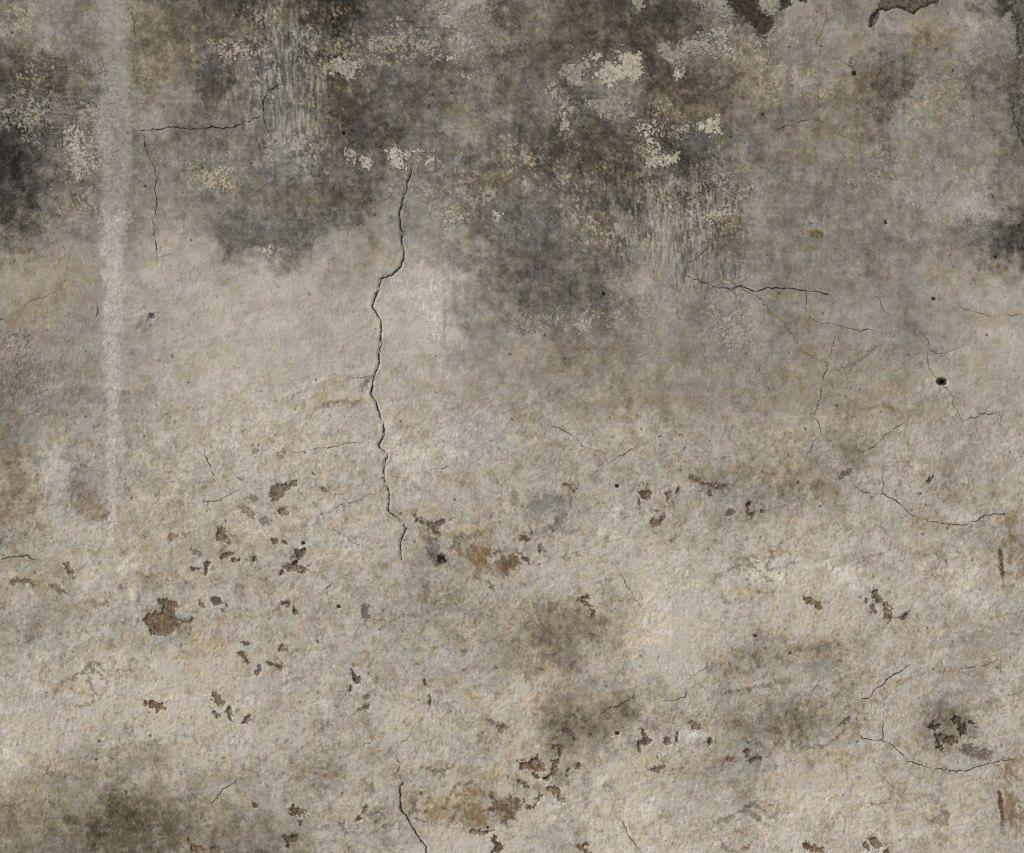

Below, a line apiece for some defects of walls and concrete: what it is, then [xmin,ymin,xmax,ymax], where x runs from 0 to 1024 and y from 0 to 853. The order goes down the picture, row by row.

damp [251,0,366,45]
damp [571,0,701,52]
damp [0,123,48,234]
crack [111,84,280,259]
damp [406,277,446,348]
crack [295,174,411,560]
crack [675,244,893,465]
crack [854,477,1013,526]
spalling [271,538,309,575]
spalling [143,597,229,636]
spalling [517,726,582,809]
spalling [928,715,992,761]